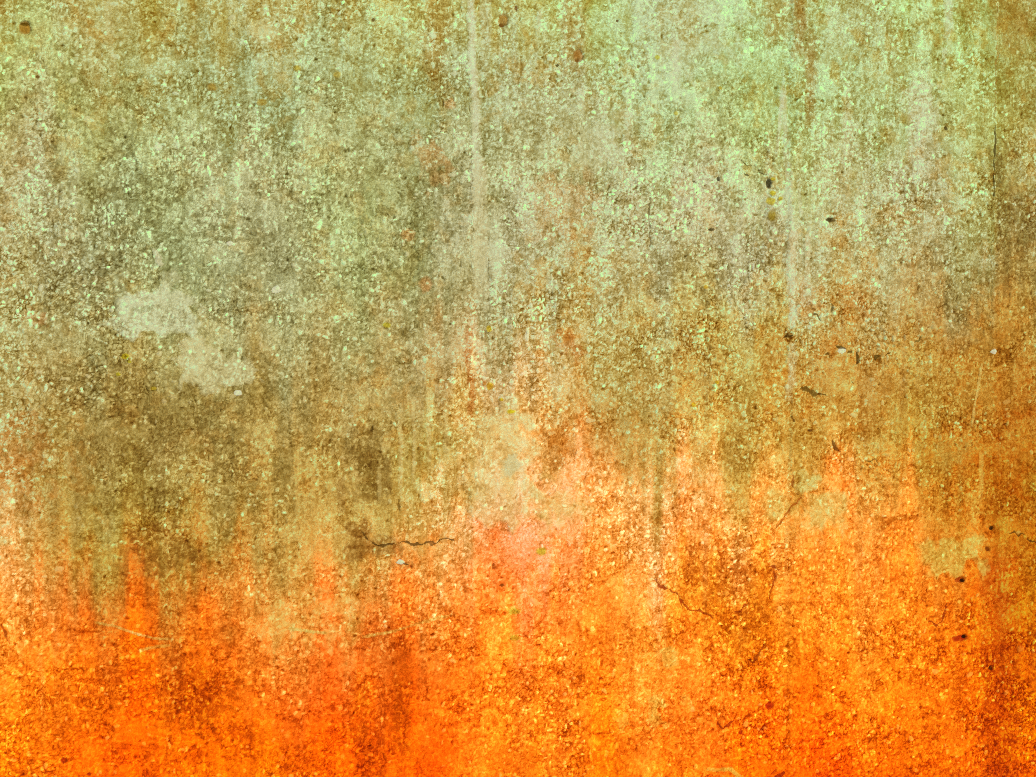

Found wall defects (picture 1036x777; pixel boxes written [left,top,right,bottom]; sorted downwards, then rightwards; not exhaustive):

damp [1,0,451,592]
damp [460,0,508,338]
crack [362,532,455,565]